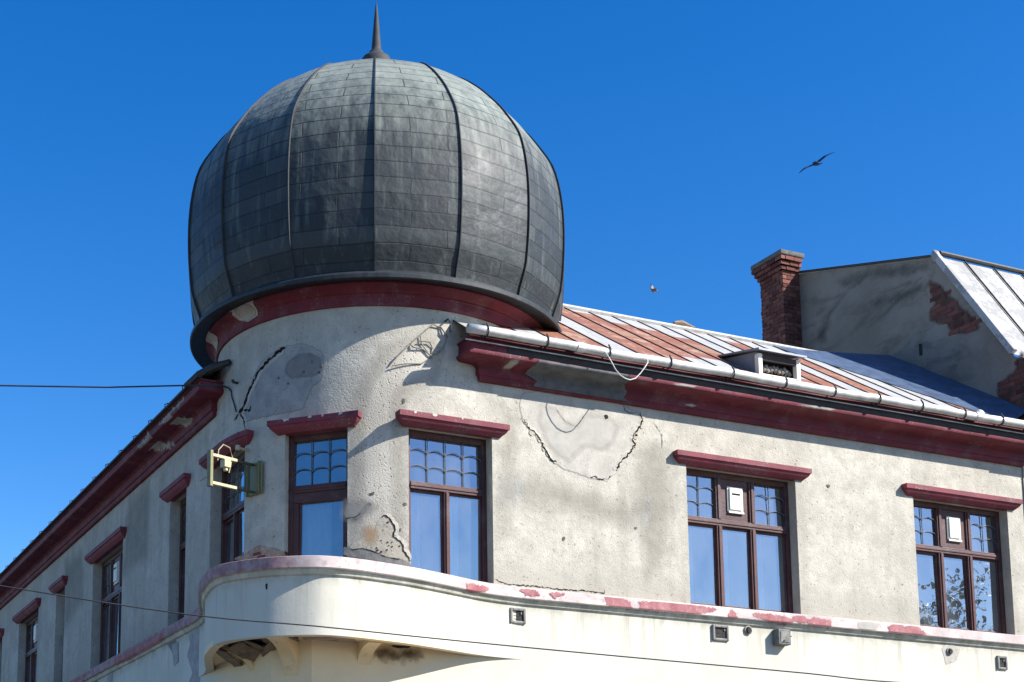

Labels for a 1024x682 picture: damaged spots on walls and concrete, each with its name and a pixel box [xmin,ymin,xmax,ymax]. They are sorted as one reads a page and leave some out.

peeling [229,300,258,322]
flaking render [929,281,982,336]
flaking render [997,352,1024,419]
spalling [343,513,412,566]
peeling [465,582,489,593]
peeling [520,588,565,599]
peeling [605,597,738,620]
peeling [753,613,832,628]
peeling [858,622,927,637]